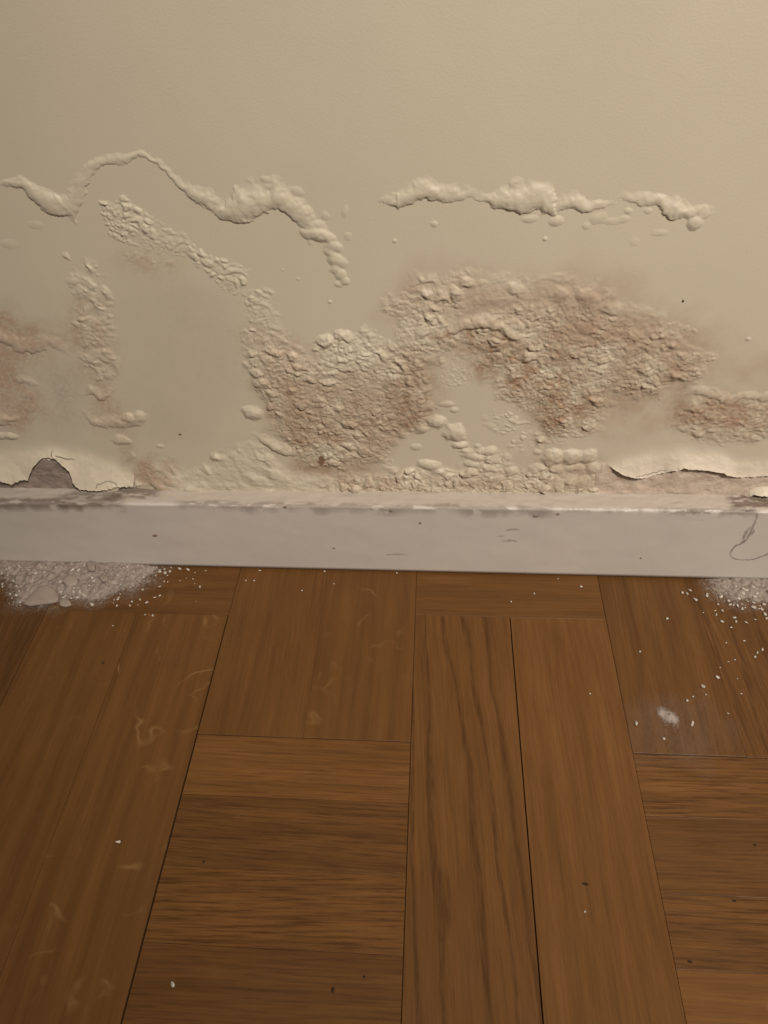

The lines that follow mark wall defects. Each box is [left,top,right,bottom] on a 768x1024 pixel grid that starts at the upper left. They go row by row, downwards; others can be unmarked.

peeling [0,441,148,492]
peeling [594,443,768,497]